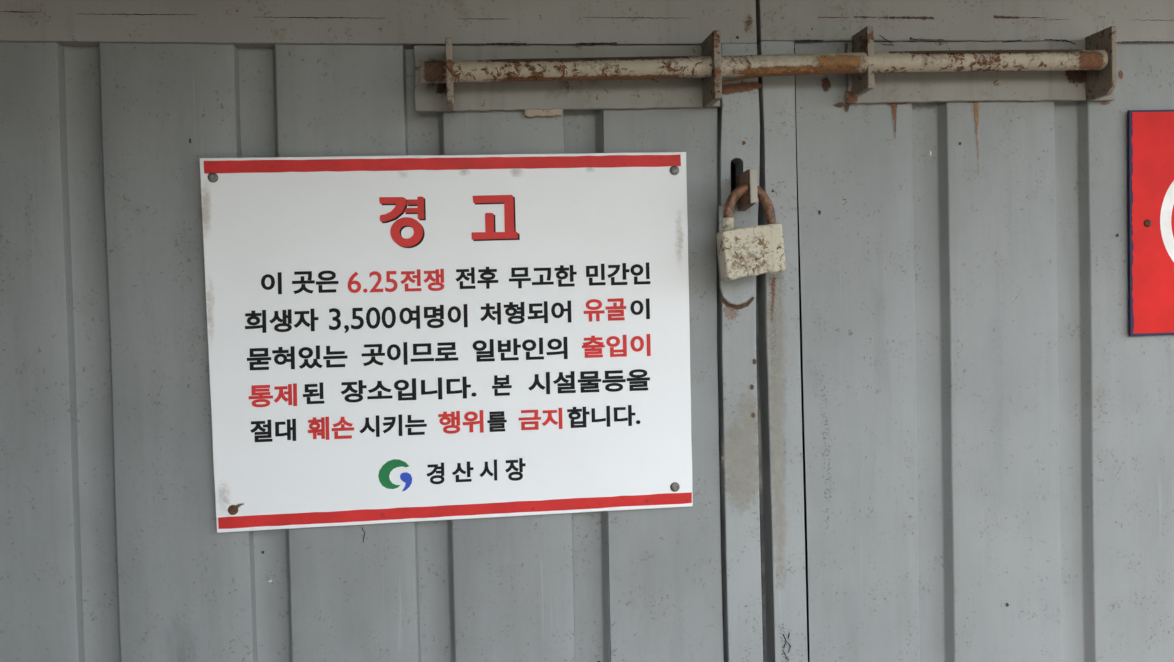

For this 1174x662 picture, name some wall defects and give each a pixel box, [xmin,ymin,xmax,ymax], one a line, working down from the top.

rust [722,55,865,112]
rust [889,49,1104,88]
rust [887,103,907,132]